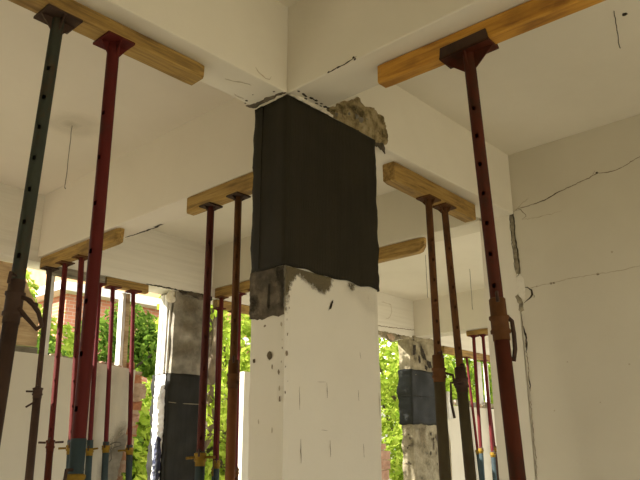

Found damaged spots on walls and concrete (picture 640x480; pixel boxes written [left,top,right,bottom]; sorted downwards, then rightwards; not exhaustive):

spalling [245,91,388,154]
crack [509,157,639,300]
peeling [249,265,290,327]
spalling [378,330,434,370]
crack [522,321,537,474]